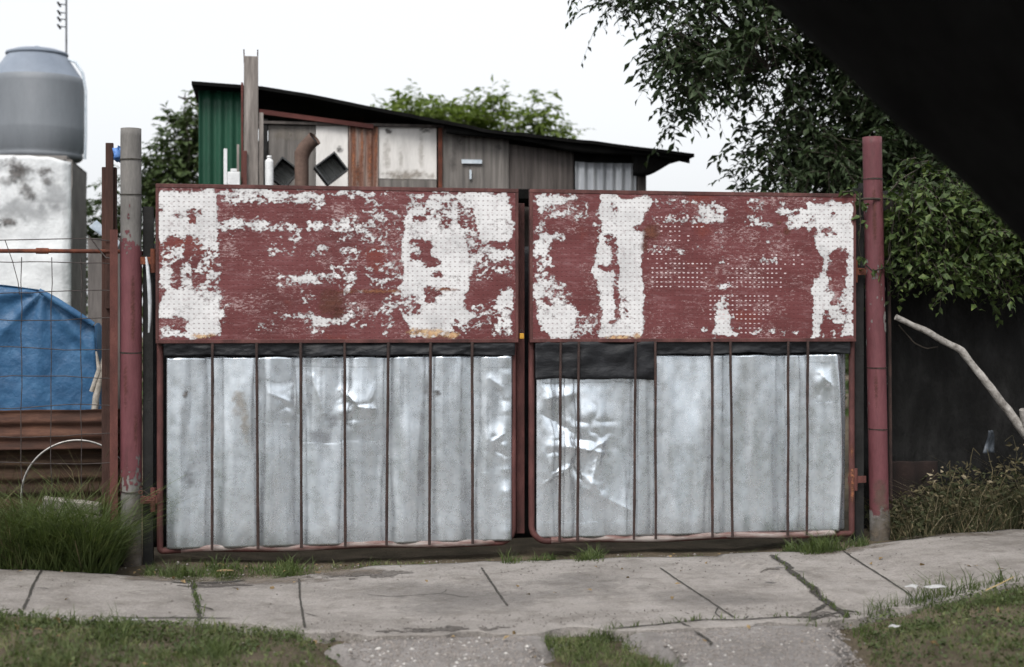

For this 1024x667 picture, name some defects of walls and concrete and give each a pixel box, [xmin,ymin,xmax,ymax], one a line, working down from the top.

damp [9,160,50,199]
peeling [159,188,515,340]
peeling [533,193,804,339]
peeling [745,199,886,347]
crack [610,555,856,645]